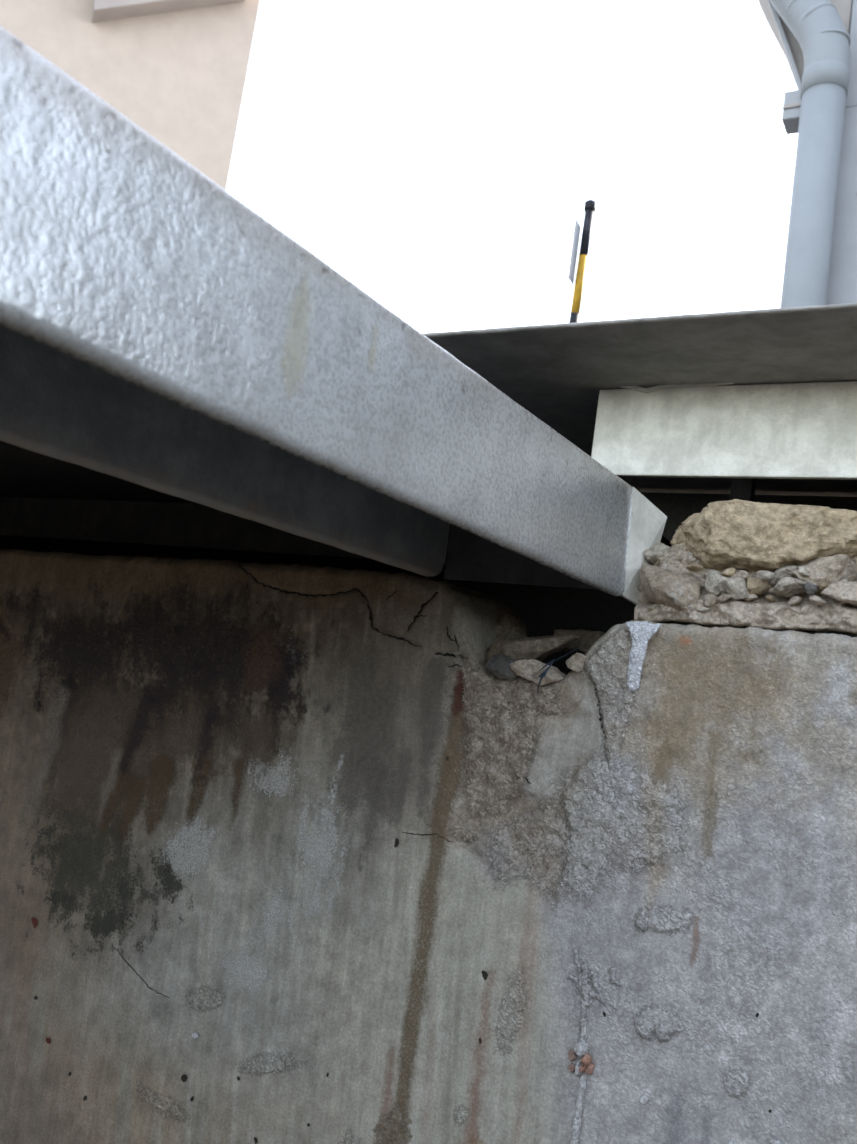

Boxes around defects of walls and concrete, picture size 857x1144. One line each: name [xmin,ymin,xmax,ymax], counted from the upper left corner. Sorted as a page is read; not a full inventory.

spalling [640,492,730,542]
spalling [754,495,857,511]
crack [237,563,468,669]
peeling [669,567,846,625]
peeling [0,535,692,917]
crack [593,682,604,734]
leakage [6,581,465,1126]